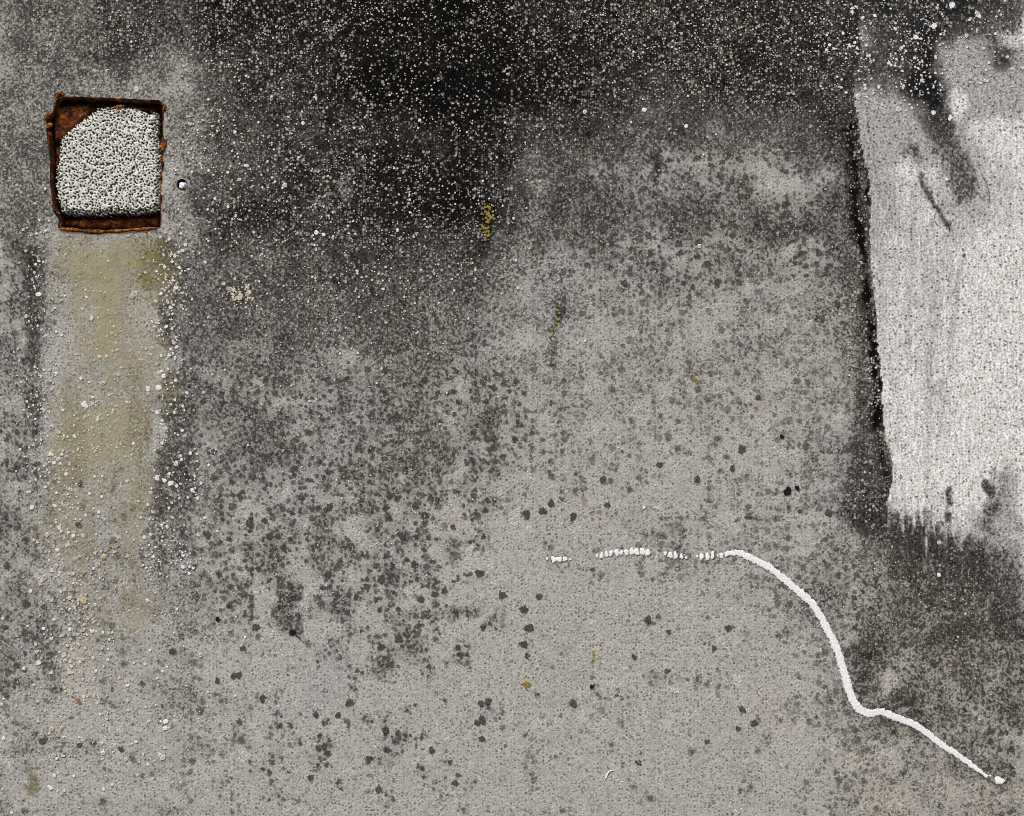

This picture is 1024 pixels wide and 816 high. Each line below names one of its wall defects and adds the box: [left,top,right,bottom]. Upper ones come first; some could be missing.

damp [51,0,1024,580]
crack [864,165,872,206]
damp [837,121,1024,792]